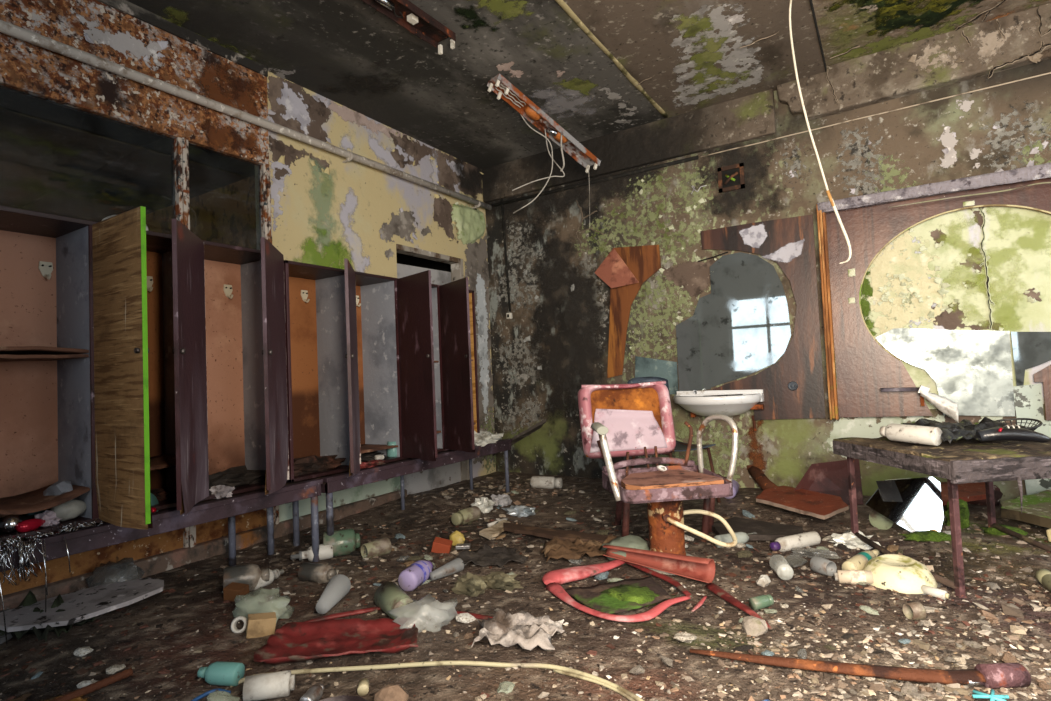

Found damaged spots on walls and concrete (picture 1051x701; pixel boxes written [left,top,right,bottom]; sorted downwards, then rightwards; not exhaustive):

peeling [144,41,168,61]
crack [955,0,1051,78]
corrosion [194,62,265,156]
leakage [455,158,482,195]
peeling [267,76,552,437]
leakage [489,165,659,423]